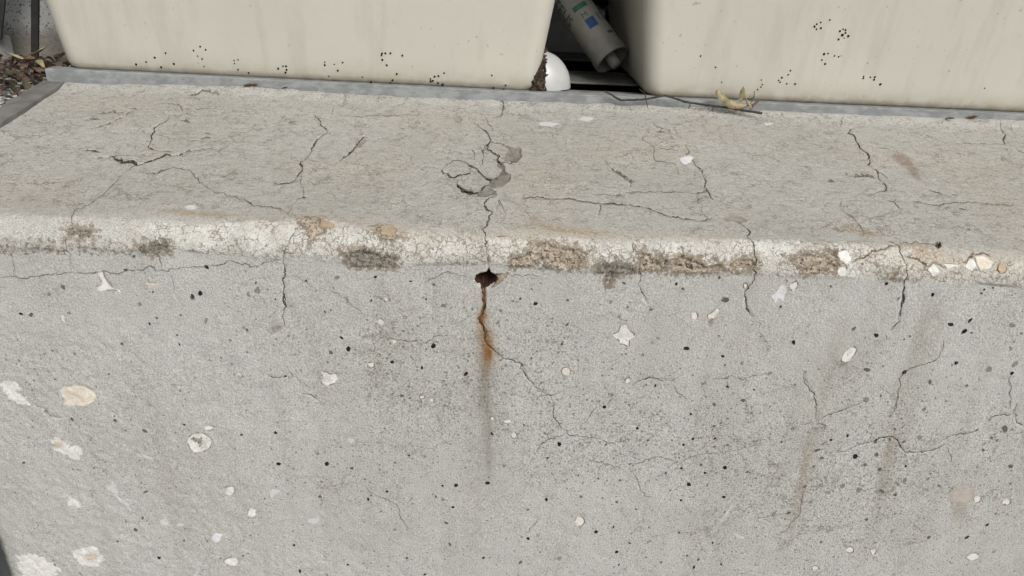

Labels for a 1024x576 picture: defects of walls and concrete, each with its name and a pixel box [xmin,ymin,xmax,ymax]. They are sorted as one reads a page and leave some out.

spalling [66,227,93,238]
spalling [139,241,169,255]
crack [1,94,419,325]
peeling [441,141,522,197]
corrosion [480,288,492,360]
spalling [491,240,586,288]
crack [482,126,714,260]
crack [738,222,767,342]
crack [886,242,908,339]
crack [836,118,1017,236]
crack [373,271,763,497]
crack [840,341,1022,460]